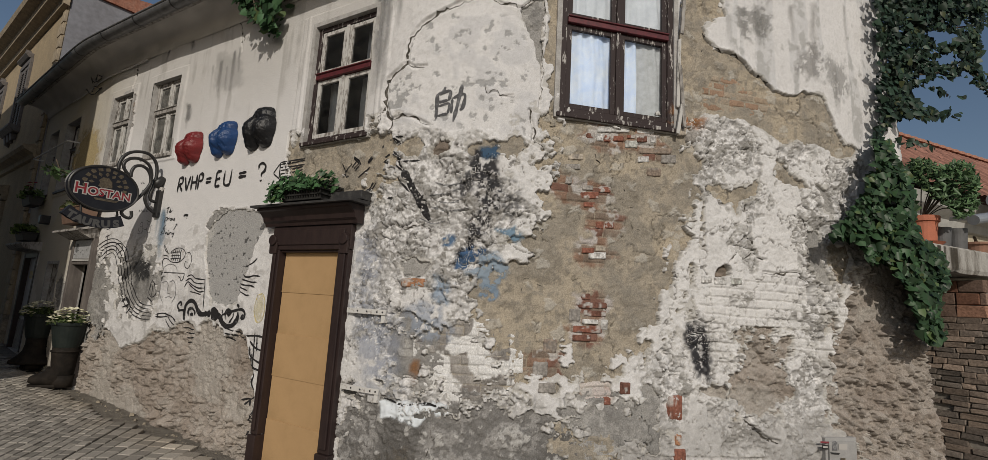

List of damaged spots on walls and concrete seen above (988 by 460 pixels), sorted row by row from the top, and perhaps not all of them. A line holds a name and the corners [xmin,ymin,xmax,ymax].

crack [378,0,549,153]
spalling [206,207,266,307]
spalling [288,111,450,201]
spalling [335,0,855,460]
spalling [75,245,254,460]